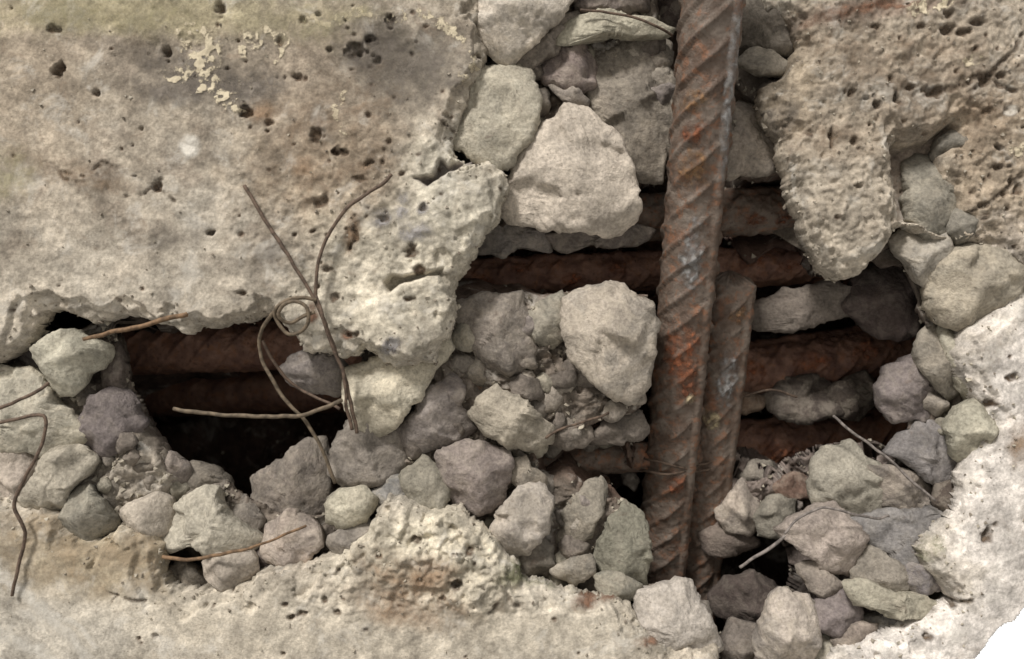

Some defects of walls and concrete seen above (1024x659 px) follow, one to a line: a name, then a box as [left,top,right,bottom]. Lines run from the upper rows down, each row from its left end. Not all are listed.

damp [135,55,279,101]
peeling [164,22,253,118]
peeling [236,25,290,64]
peeling [907,0,980,37]
peeling [996,142,1024,157]
spalling [867,115,985,327]
spalling [0,308,348,533]
spalling [300,0,916,659]
spalling [922,302,1010,436]
spalling [154,536,217,595]
spalling [236,492,639,622]
spalling [826,440,986,659]